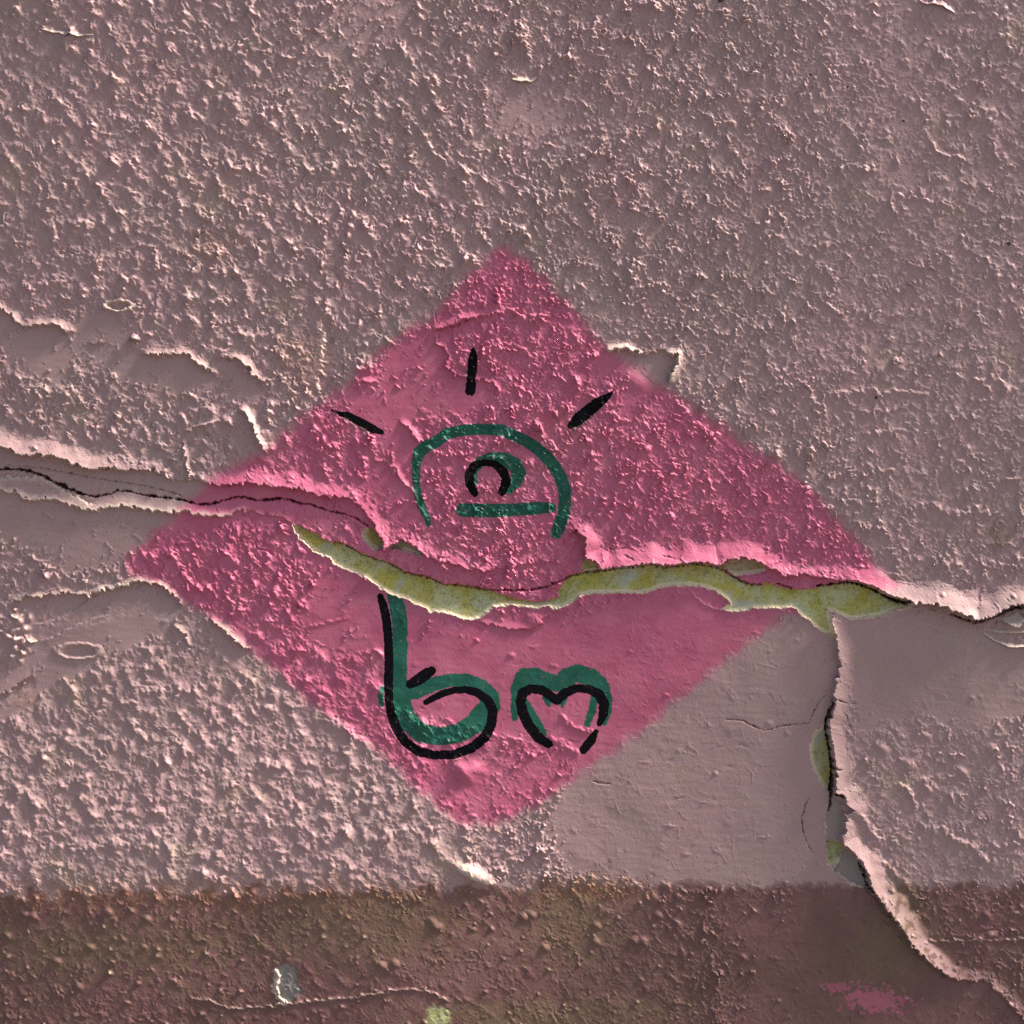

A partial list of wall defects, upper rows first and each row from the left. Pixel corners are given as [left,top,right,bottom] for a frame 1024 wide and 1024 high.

peeling [0,302,108,348]
peeling [140,347,273,384]
peeling [604,342,684,385]
peeling [980,609,1024,648]
crack [0,430,1024,1022]